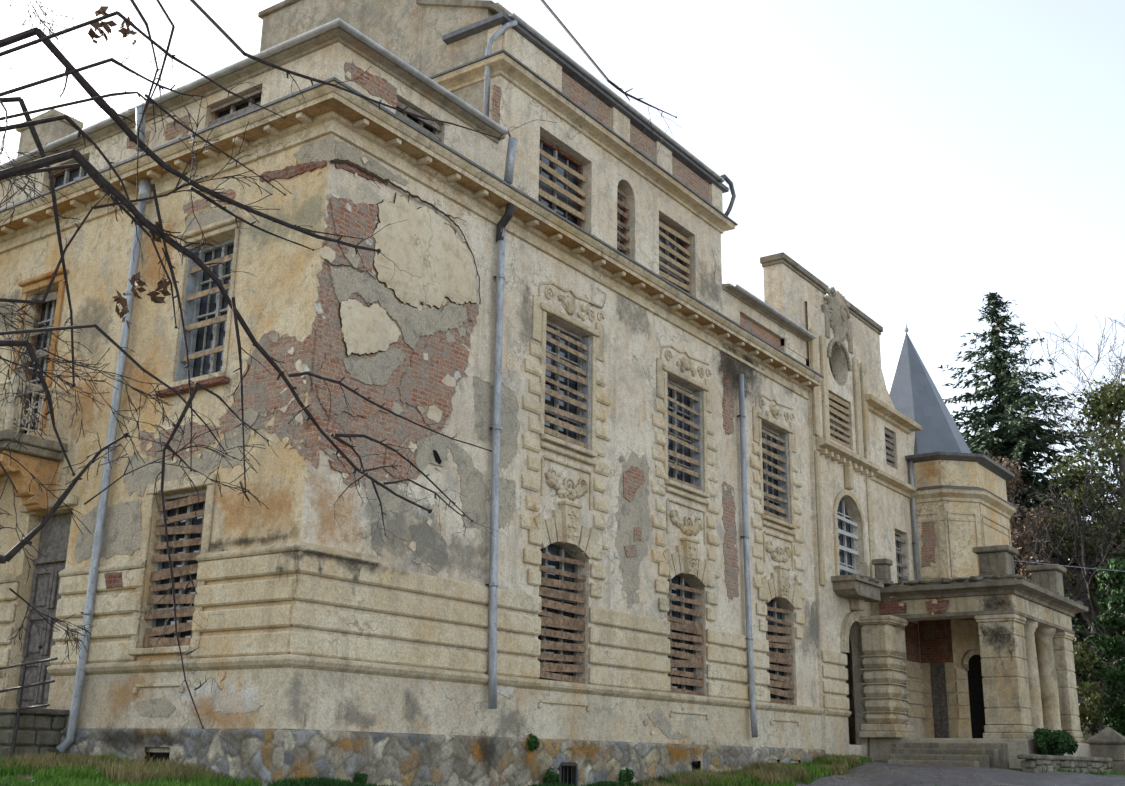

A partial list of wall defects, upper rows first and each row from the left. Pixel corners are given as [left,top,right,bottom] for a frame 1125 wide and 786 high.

flaking render [344,60,398,107]
flaking render [182,186,238,220]
flaking render [259,157,389,186]
spalling [138,194,479,493]
flaking render [720,352,735,435]
water stain [371,507,485,577]
spalling [613,449,653,612]
spalling [721,481,739,602]
flaking render [921,521,937,568]